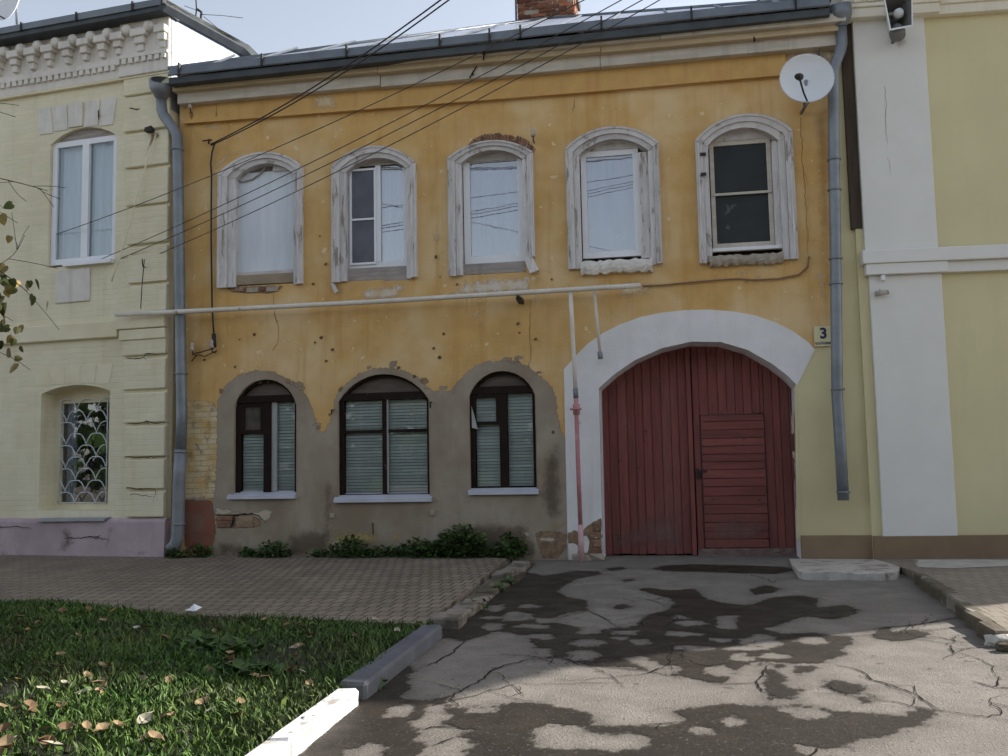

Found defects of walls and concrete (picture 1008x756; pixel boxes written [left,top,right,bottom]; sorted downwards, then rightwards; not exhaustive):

flaking render [468,133,535,152]
flaking render [184,400,273,554]
flaking render [525,518,605,561]